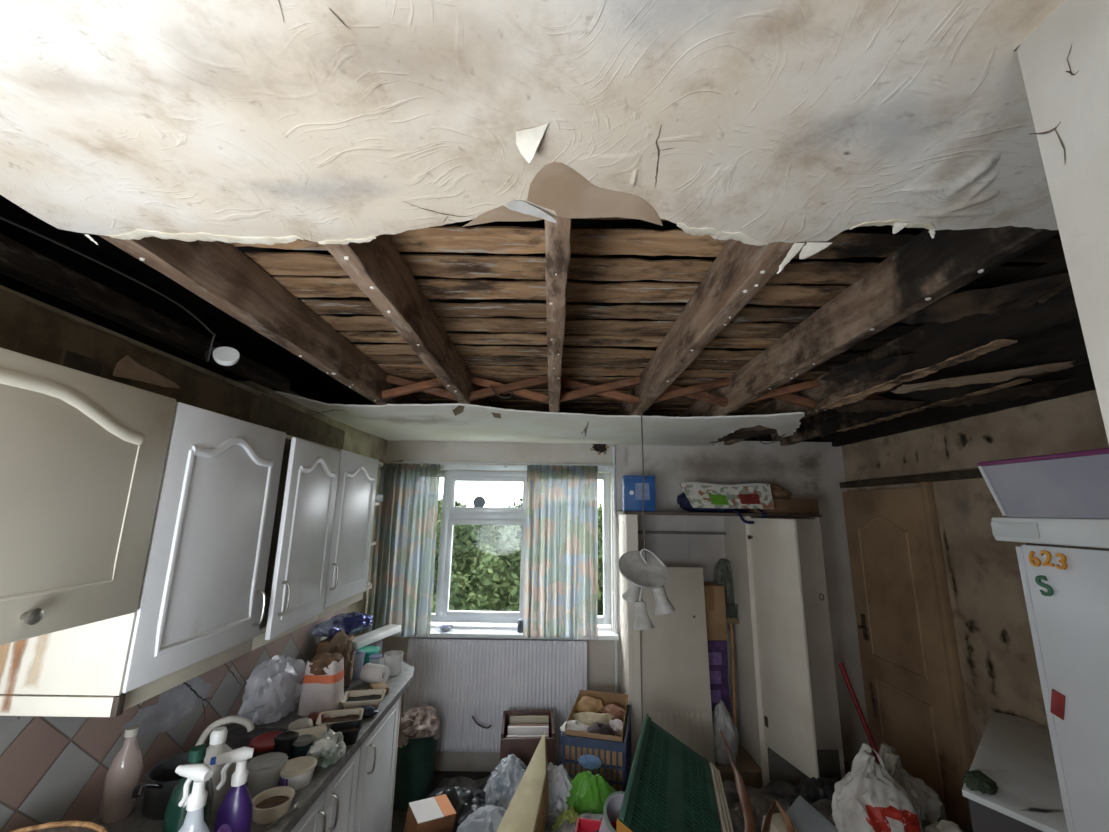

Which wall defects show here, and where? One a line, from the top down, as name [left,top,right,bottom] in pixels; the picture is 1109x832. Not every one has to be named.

crack [1066,45,1079,76]
crack [655,124,675,186]
crack [1030,121,1066,161]
spalling [462,123,663,227]
spalling [110,229,305,245]
spalling [318,236,376,245]
spalling [677,223,768,246]
spalling [850,219,935,230]
flaking render [0,289,260,424]